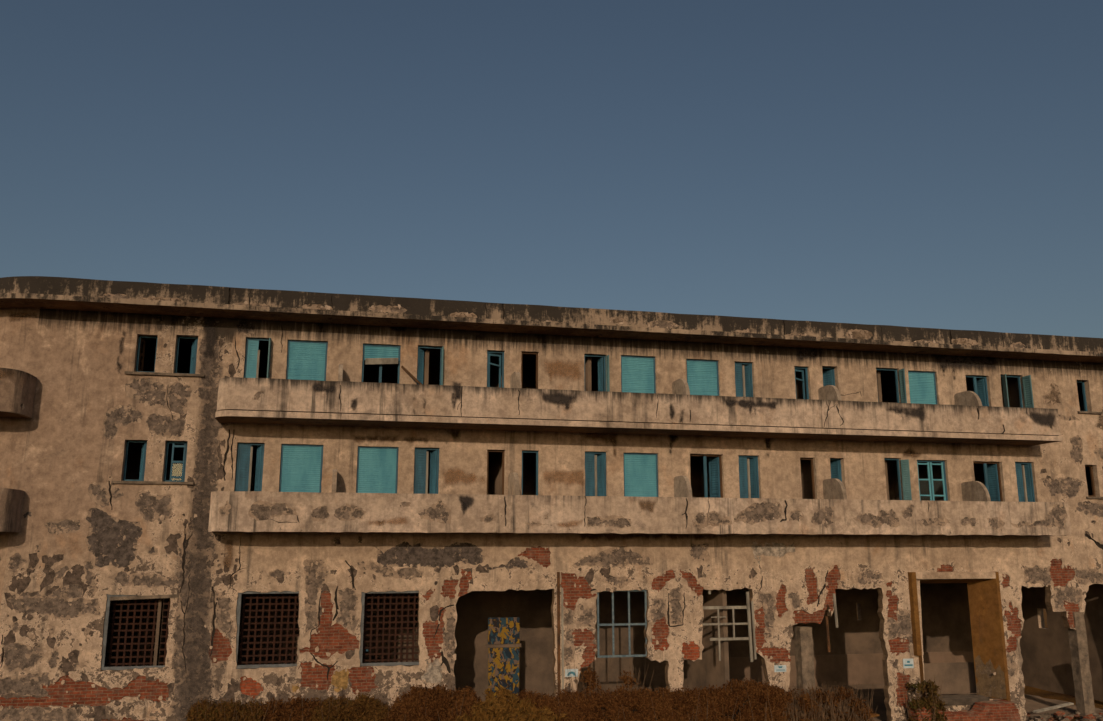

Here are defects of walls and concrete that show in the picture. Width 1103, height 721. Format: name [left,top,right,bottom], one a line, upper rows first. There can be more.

flaking render [1042,383,1079,423]
flaking render [1095,406,1103,430]
flaking render [1068,435,1103,469]
peeling [586,515,631,528]
peeling [692,501,835,529]
flaking render [853,469,1103,546]
spalling [937,564,956,572]
flaking render [1024,558,1103,588]
flaking render [560,542,710,671]
flaking render [754,565,841,664]
flaking render [856,570,913,708]
flaking render [975,574,1023,700]